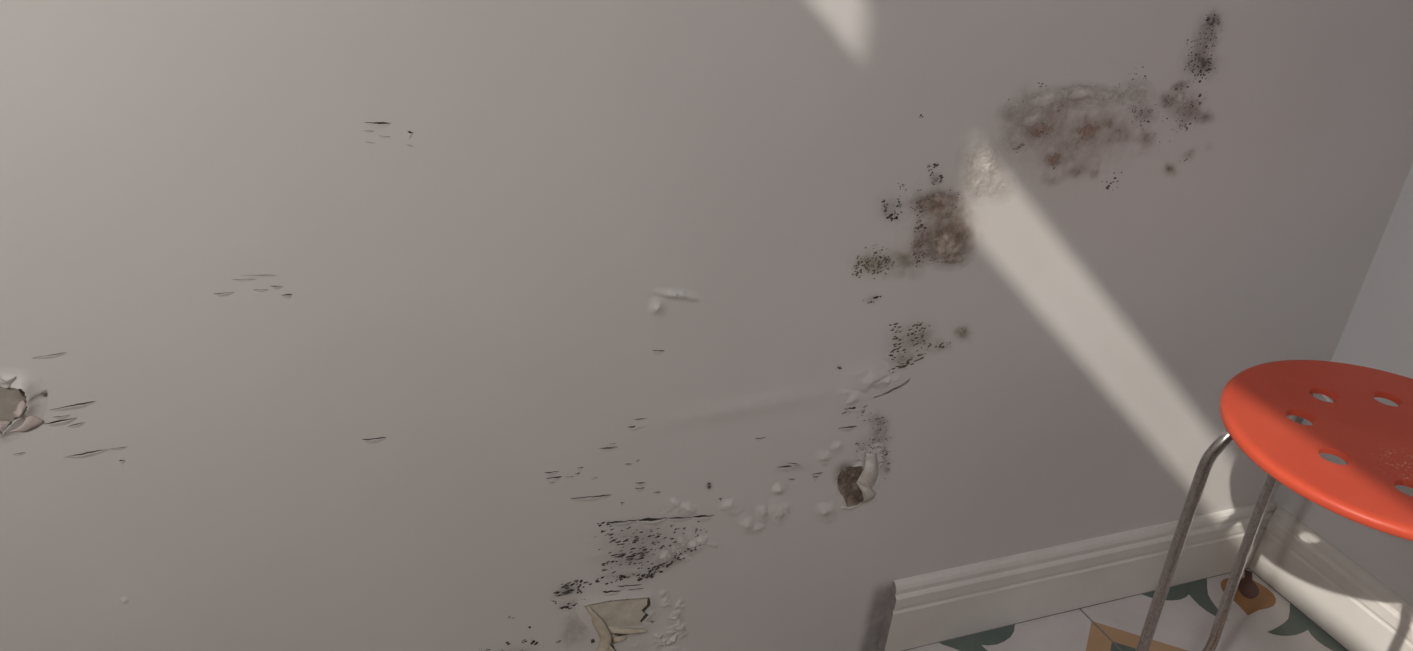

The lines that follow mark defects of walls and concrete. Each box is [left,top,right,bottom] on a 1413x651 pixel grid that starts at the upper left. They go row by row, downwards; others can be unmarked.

damp [1077,14,1220,143]
damp [851,163,967,279]
damp [888,322,966,373]
peeling [0,367,49,445]
flaking render [830,426,888,511]
damp [551,519,708,610]
peeling [571,585,663,651]